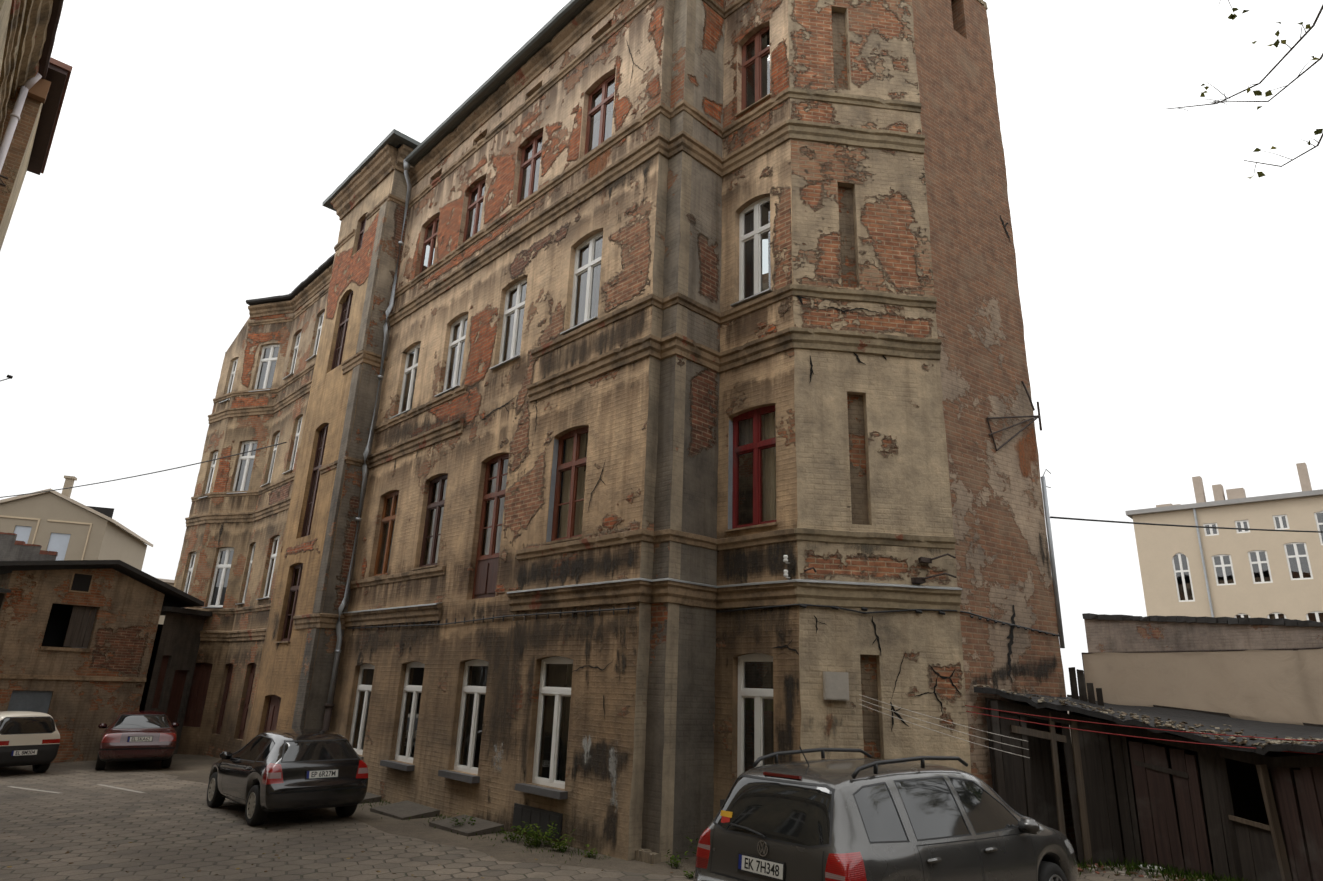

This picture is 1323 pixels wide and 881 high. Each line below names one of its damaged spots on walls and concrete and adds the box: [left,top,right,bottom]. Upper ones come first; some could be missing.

spalling [612,41,637,147]
spalling [644,0,664,99]
spalling [687,0,918,127]
spalling [325,92,584,330]
spalling [601,202,652,313]
spalling [747,145,933,343]
spalling [412,305,499,437]
spalling [499,294,570,562]
leakage [517,549,636,590]
spalling [800,549,951,585]
spalling [901,649,964,733]
leakage [477,736,628,849]